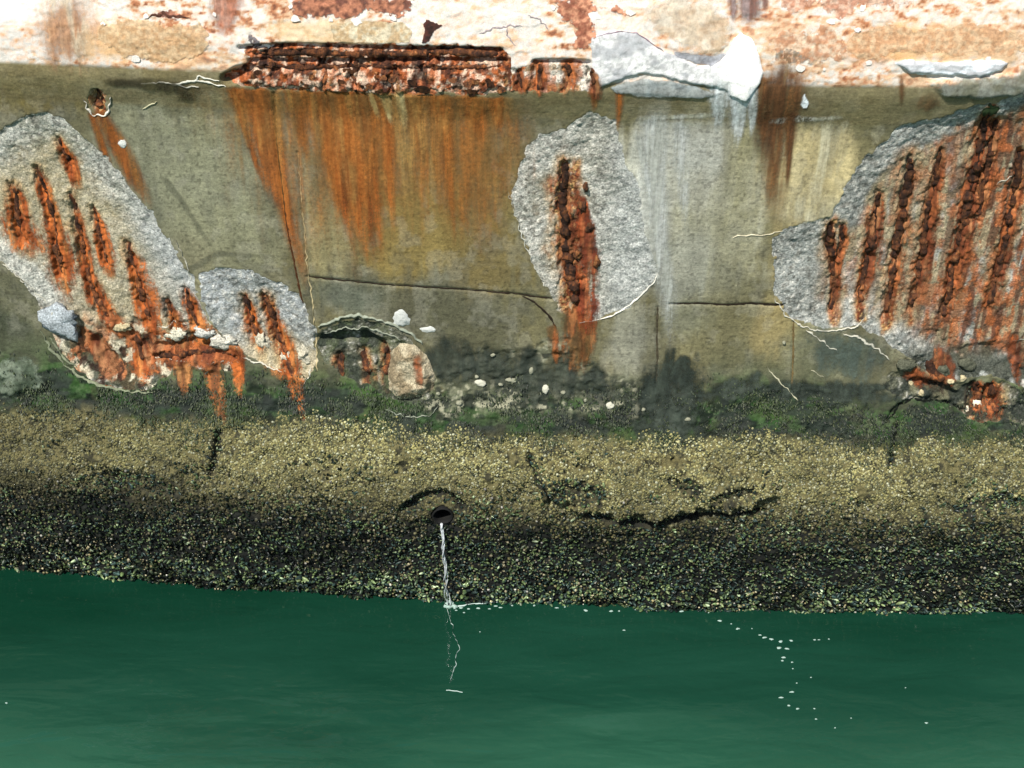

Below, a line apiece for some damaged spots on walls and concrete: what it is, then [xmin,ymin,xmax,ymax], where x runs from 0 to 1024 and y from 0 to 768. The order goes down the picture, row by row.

rust [89,108,144,194]
spalling [0,112,437,418]
rust [230,88,503,258]
crack [273,92,556,370]
spalling [225,0,658,333]
water stain [637,82,757,303]
rust [756,65,802,197]
water stain [775,116,847,223]
spalling [772,94,1024,425]
rust [170,337,244,420]
water stain [425,328,902,453]
crack [526,454,599,499]